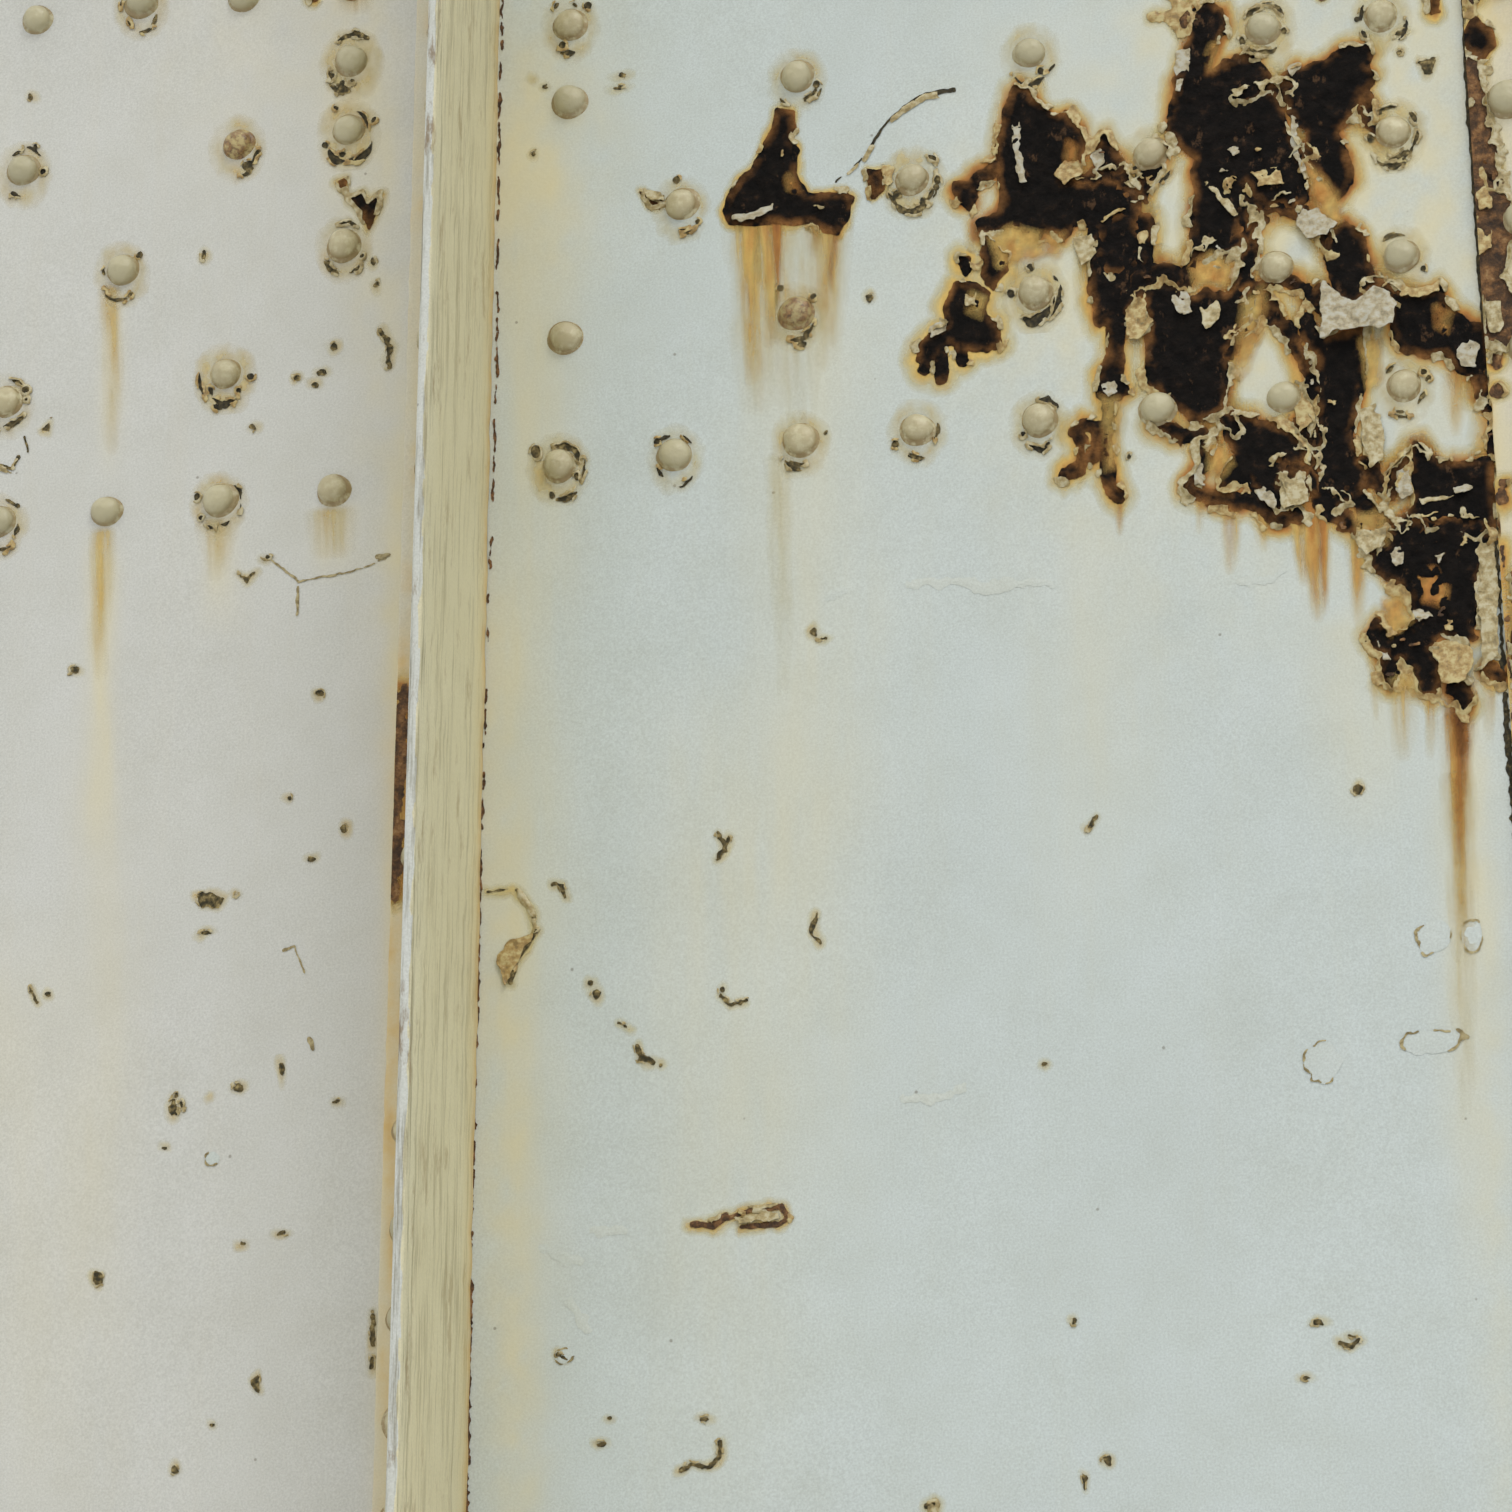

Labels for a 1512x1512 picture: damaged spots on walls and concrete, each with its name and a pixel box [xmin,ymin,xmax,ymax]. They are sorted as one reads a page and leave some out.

peeling [1146,0,1203,39]
peeling [1237,0,1290,63]
peeling [1391,16,1436,74]
peeling [1364,103,1422,172]
peeling [885,153,943,217]
rust [719,106,895,341]
peeling [1004,262,1064,328]
peeling [891,423,940,463]
rust [904,0,1512,903]
crack [271,553,391,616]
rust [391,677,409,904]
peeling [485,886,541,985]